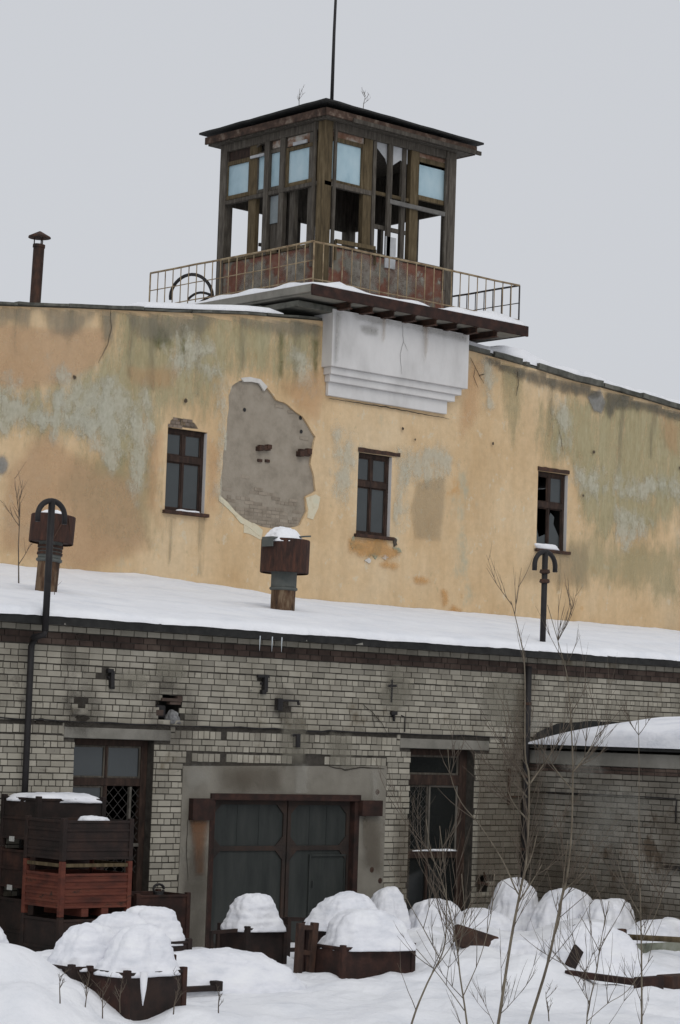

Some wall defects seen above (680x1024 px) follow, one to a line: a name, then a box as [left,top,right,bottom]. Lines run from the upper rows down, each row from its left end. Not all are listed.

damp [0,366,154,491]
spalling [168,417,198,429]
flaking render [218,377,320,540]
peeling [364,538,401,563]
spalling [156,696,182,724]